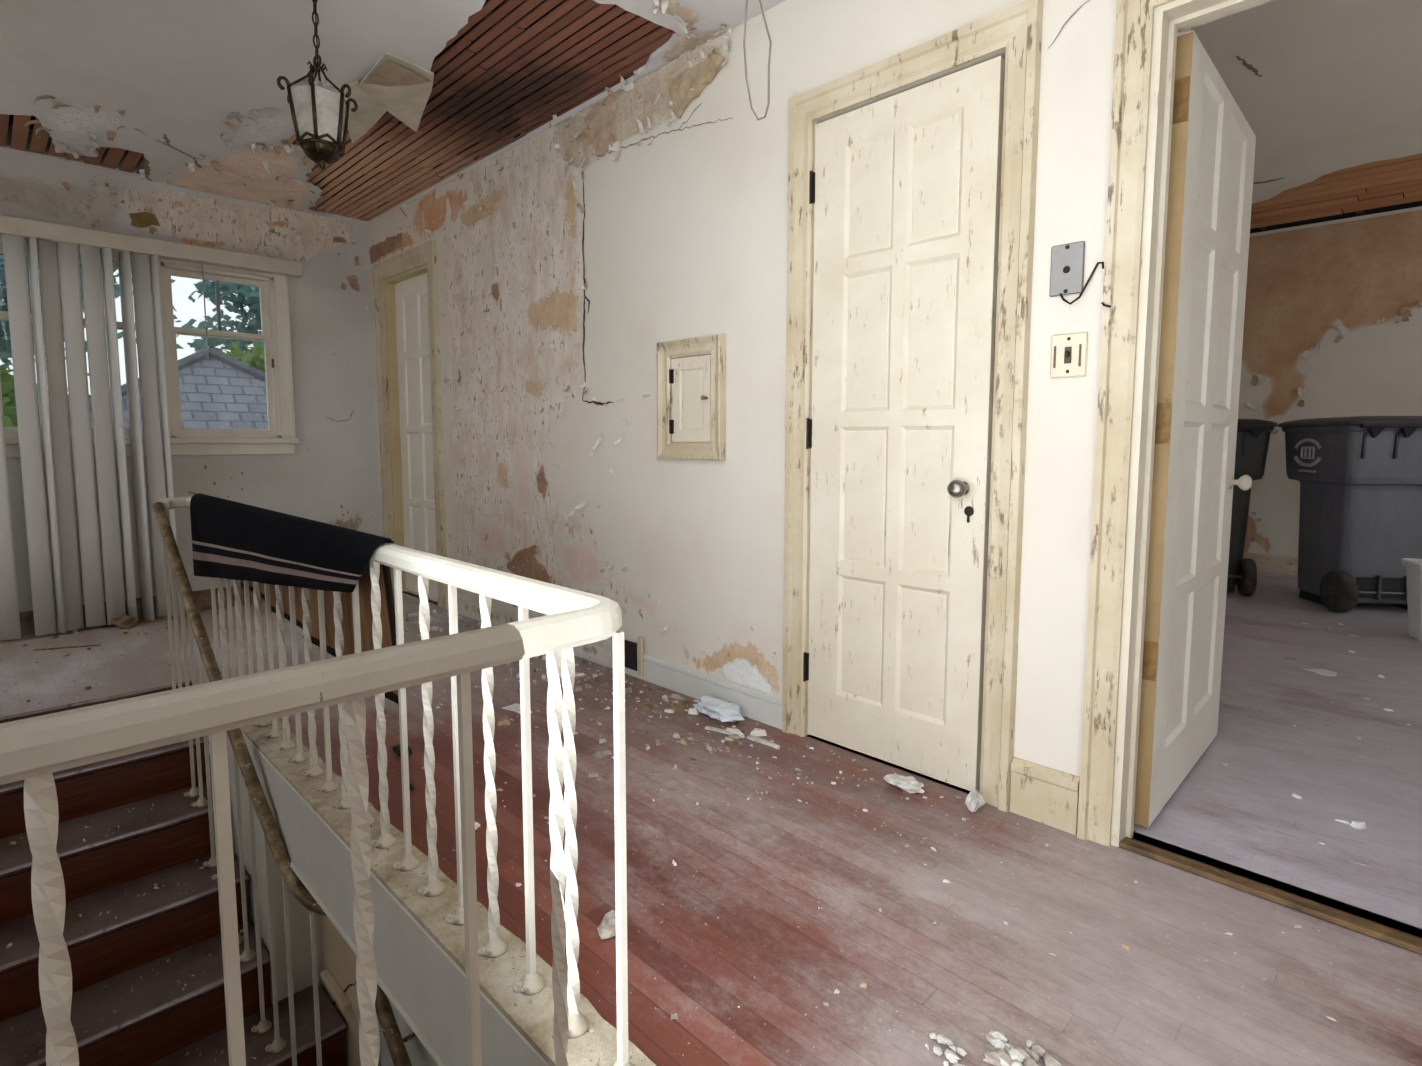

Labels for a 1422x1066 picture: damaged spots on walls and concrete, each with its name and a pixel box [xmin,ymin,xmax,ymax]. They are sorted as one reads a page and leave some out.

peeling [24,95,148,158]
peeling [118,0,783,697]
crack [582,103,733,406]
flaking render [1241,210,1422,435]